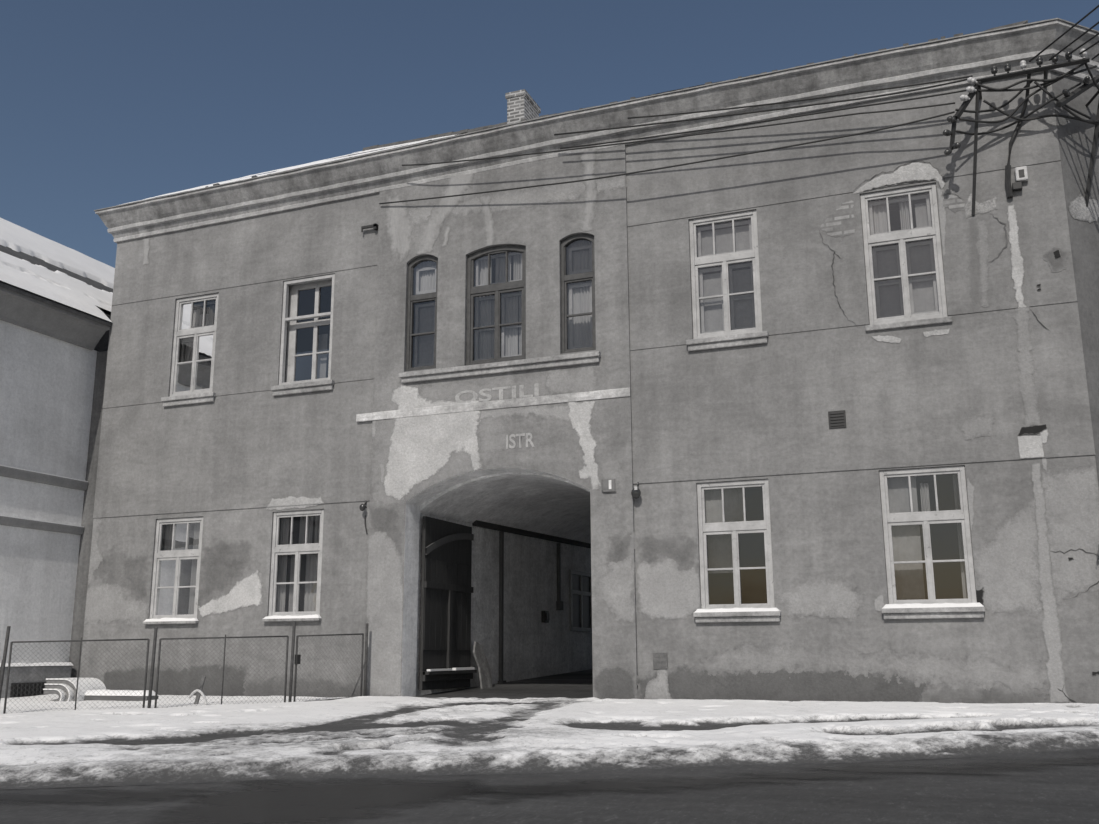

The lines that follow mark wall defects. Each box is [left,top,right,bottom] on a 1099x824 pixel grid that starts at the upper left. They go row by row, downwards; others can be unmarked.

spalling [1068,194,1099,223]
peeling [367,373,548,515]
peeling [567,400,623,490]
peeling [197,570,263,618]